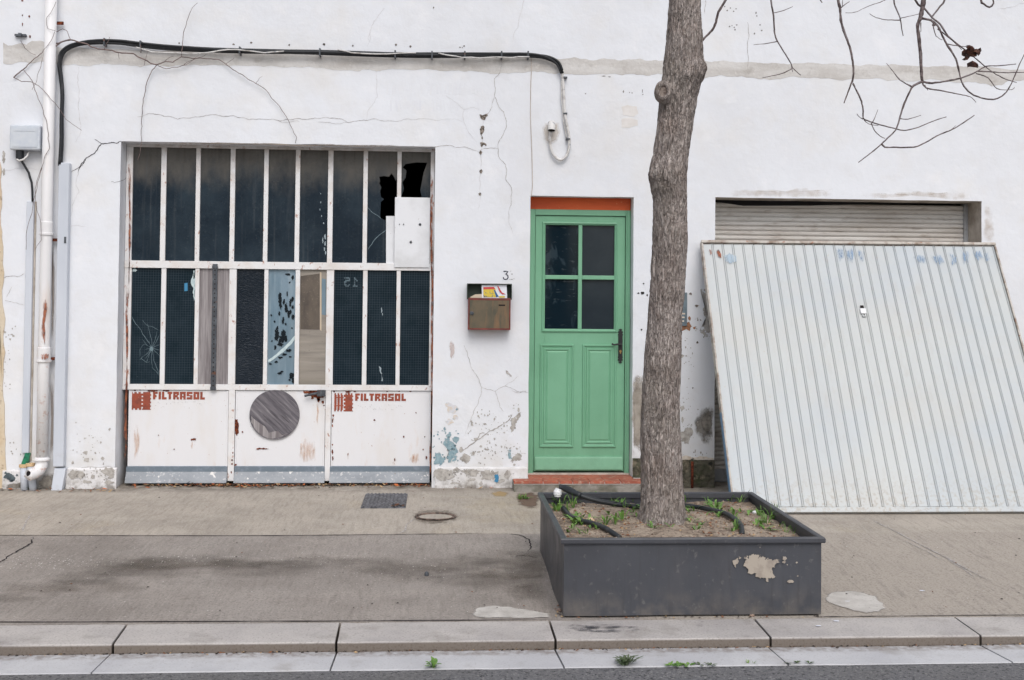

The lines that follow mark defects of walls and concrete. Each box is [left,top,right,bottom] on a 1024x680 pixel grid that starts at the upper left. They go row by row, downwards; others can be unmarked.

crack [71,67,121,227]
crack [139,1,524,229]
peeling [433,402,522,486]
crack [464,346,528,450]
peeling [680,289,714,460]